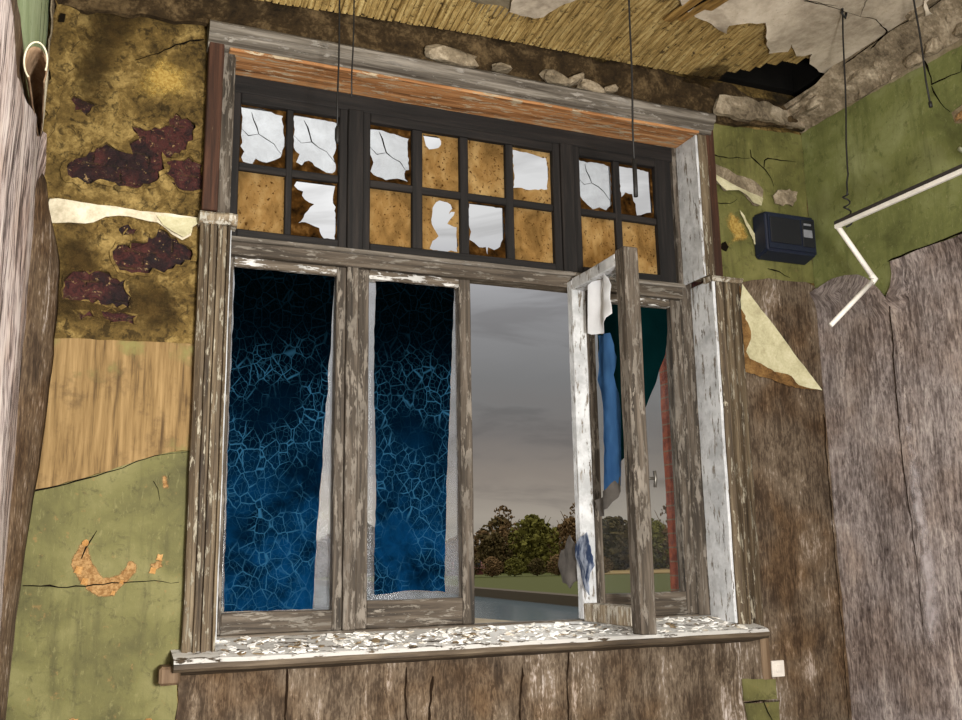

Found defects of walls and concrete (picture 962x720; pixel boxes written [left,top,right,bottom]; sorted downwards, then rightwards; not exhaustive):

crack [925,61,962,112]
spalling [60,107,203,194]
spalling [60,223,198,325]
crack [23,580,178,588]
peeling [71,539,136,597]
peeling [149,554,163,574]